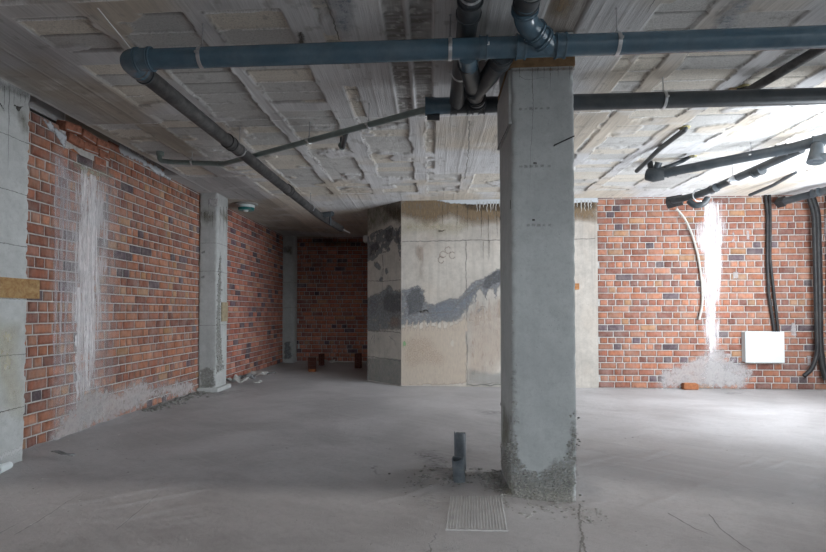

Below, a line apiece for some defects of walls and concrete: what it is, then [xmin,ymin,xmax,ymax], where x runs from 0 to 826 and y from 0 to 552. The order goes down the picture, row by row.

water stain [368,199,500,256]
water stain [574,198,598,219]
water stain [55,165,194,440]
water stain [662,203,752,387]
spalling [500,430,582,503]
crack [577,504,592,552]